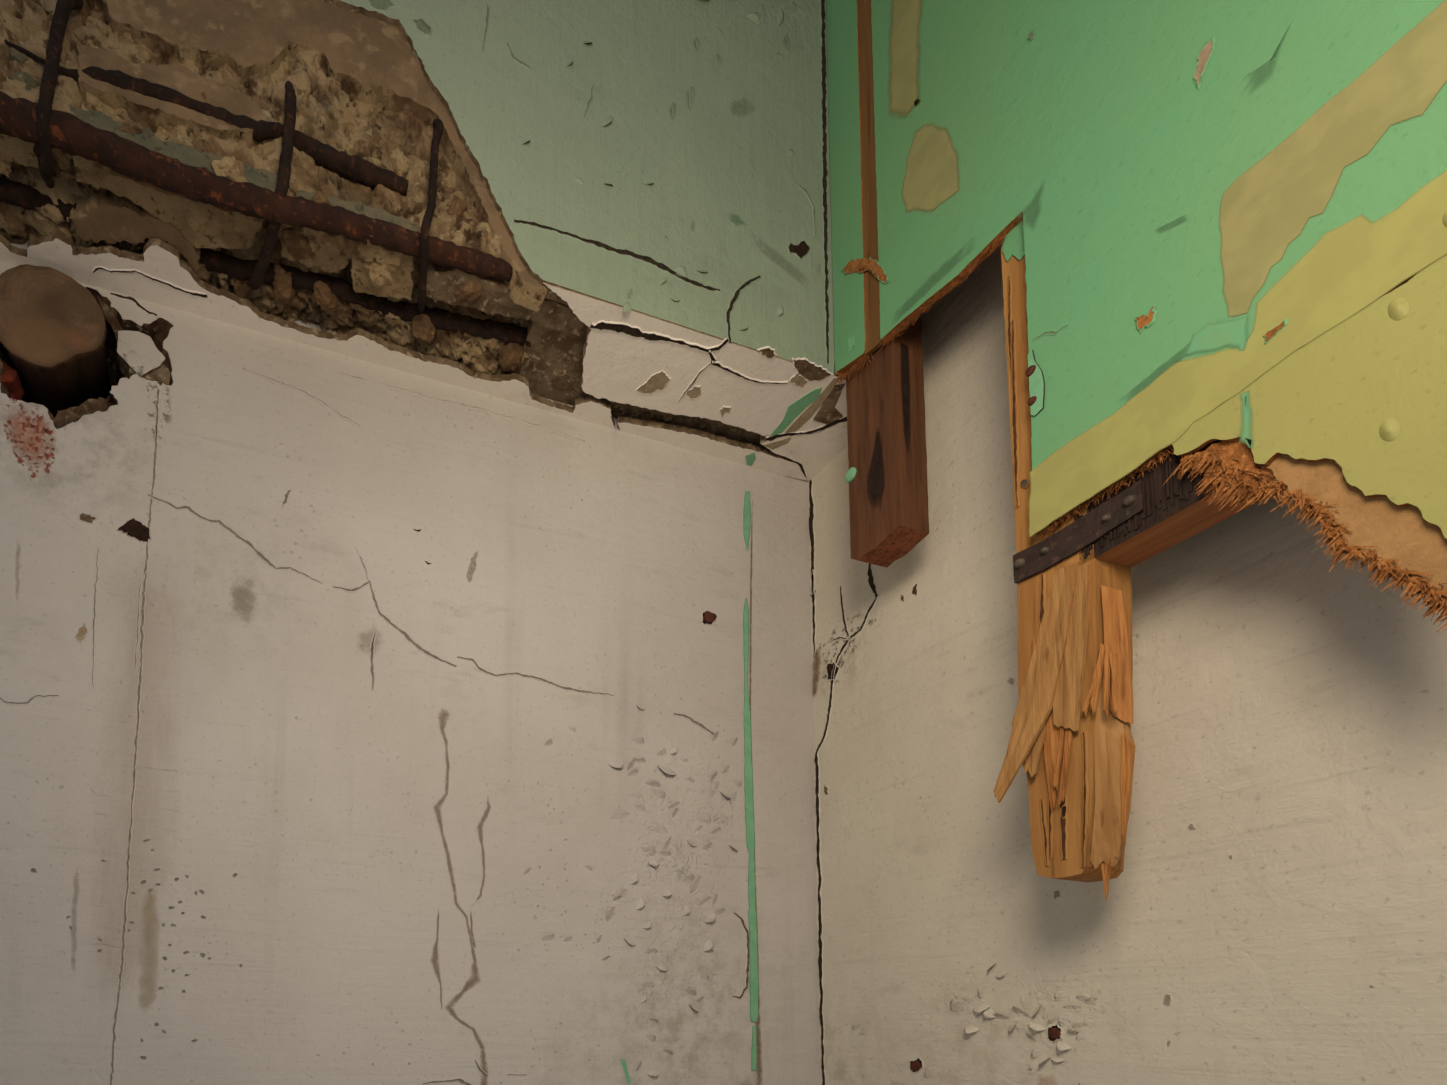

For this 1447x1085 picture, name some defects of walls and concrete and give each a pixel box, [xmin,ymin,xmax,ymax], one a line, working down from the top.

spalling [0,0,585,375]
rust [4,395,55,478]
flaking render [0,287,173,429]
crack [514,219,788,402]
crack [766,415,847,442]
crack [0,548,101,706]
crack [109,389,614,1085]
crack [809,479,879,1085]